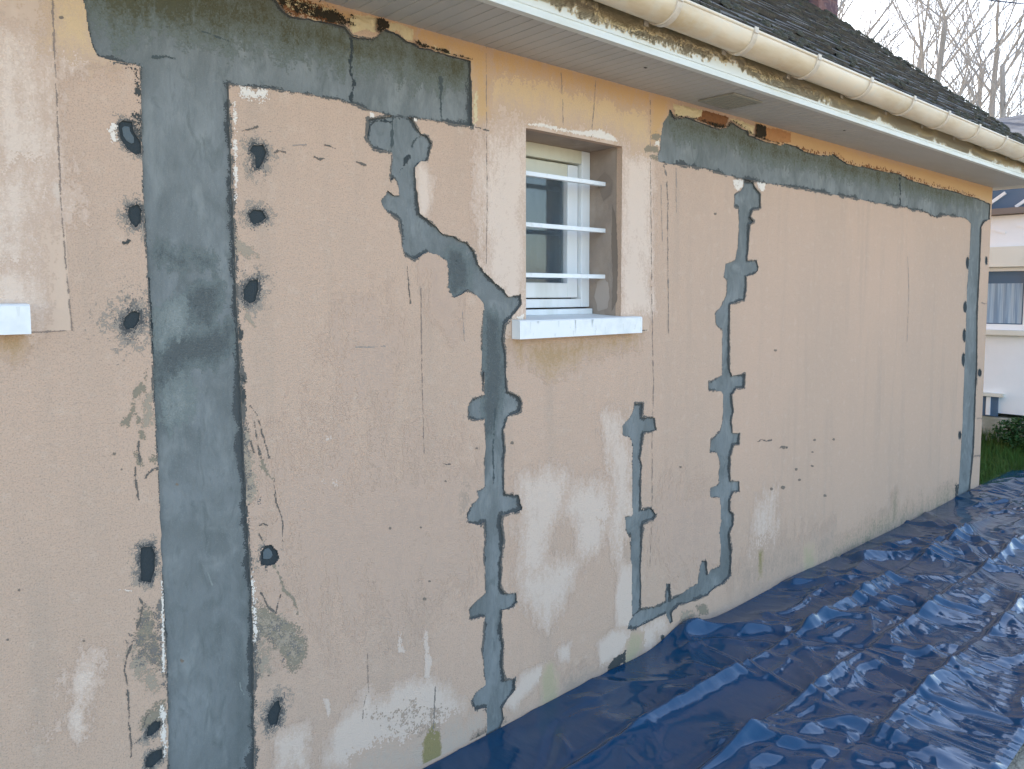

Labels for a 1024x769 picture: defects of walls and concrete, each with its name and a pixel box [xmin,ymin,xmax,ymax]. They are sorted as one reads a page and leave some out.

spalling [278,0,473,60]
crack [368,118,420,170]
crack [475,47,489,264]
spalling [673,104,976,197]
damp [246,244,487,769]
crack [407,267,451,465]
crack [490,408,498,484]
crack [642,100,677,561]
damp [502,398,841,725]